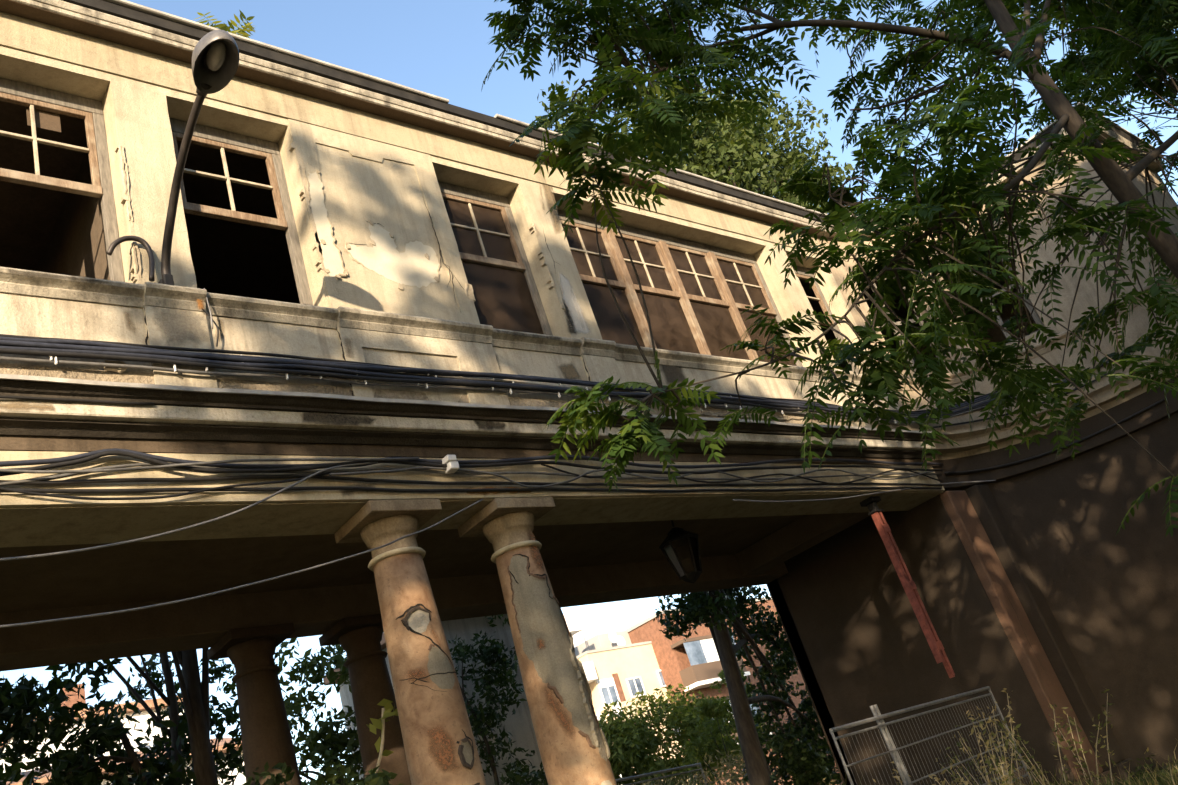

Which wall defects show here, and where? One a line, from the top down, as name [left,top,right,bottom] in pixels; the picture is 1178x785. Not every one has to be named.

peeling [288,142,441,290]
peeling [396,604,455,689]
peeling [507,554,610,766]
peeling [456,730,474,770]